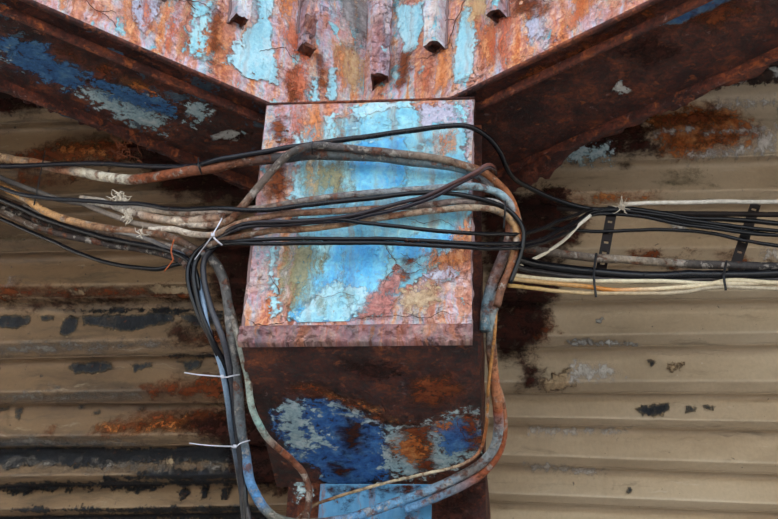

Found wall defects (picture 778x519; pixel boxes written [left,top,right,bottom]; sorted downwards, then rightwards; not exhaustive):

peeling [0,36,216,136]
corrosion [157,164,292,207]
peeling [267,100,471,163]
corrosion [496,61,778,264]
peeling [0,283,223,338]
corrosion [208,245,250,326]
peeling [263,160,472,322]
corrosion [496,260,562,394]
peeling [0,437,267,519]
corrosion [241,370,288,496]
peeling [268,398,482,484]
corrosion [290,383,482,476]